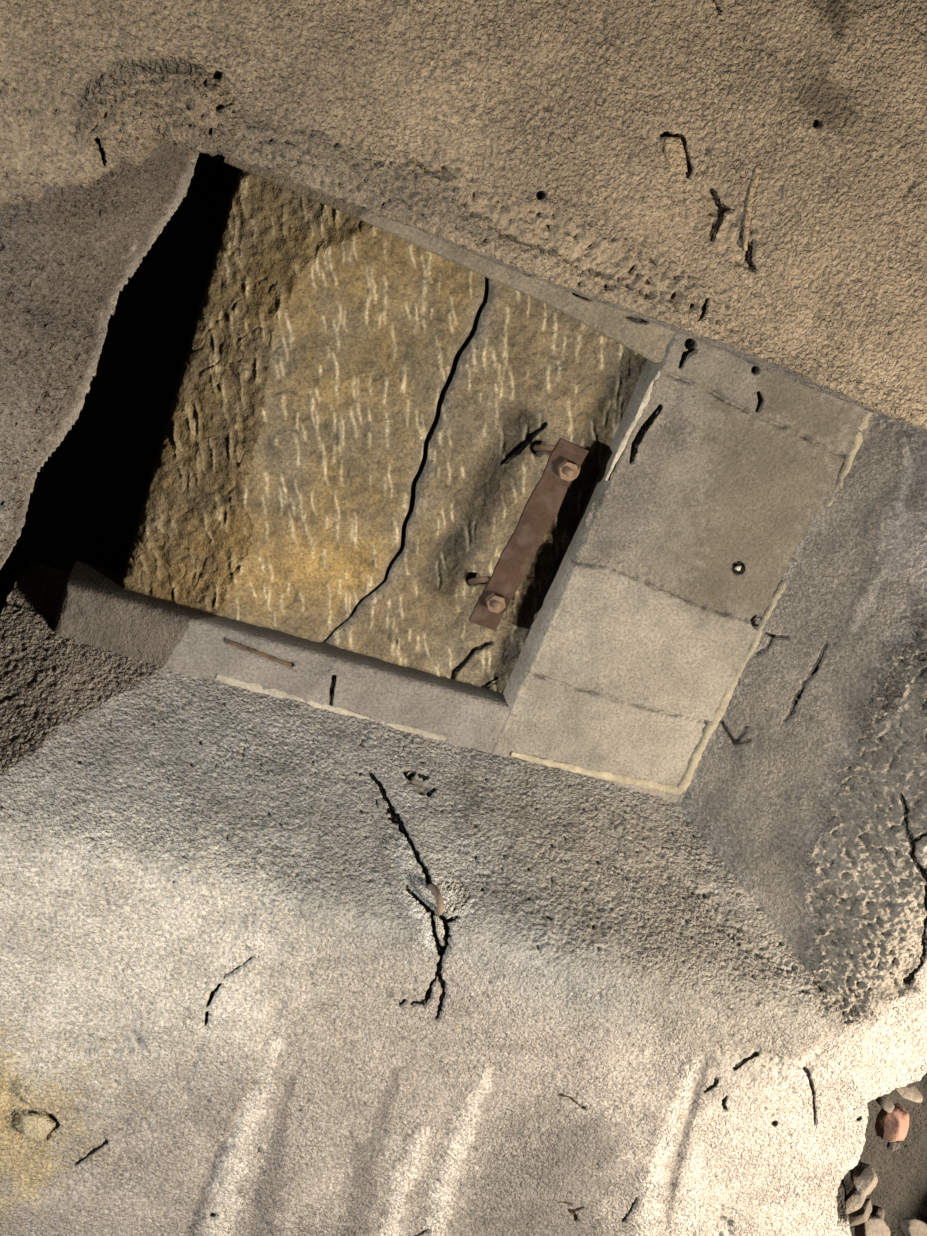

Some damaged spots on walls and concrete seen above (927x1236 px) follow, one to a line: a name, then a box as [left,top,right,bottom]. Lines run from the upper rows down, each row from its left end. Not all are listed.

crack [662,134,734,239]
crack [747,241,755,270]
crack [384,280,487,580]
crack [786,645,827,721]
crack [369,772,456,1018]
crack [901,795,927,985]